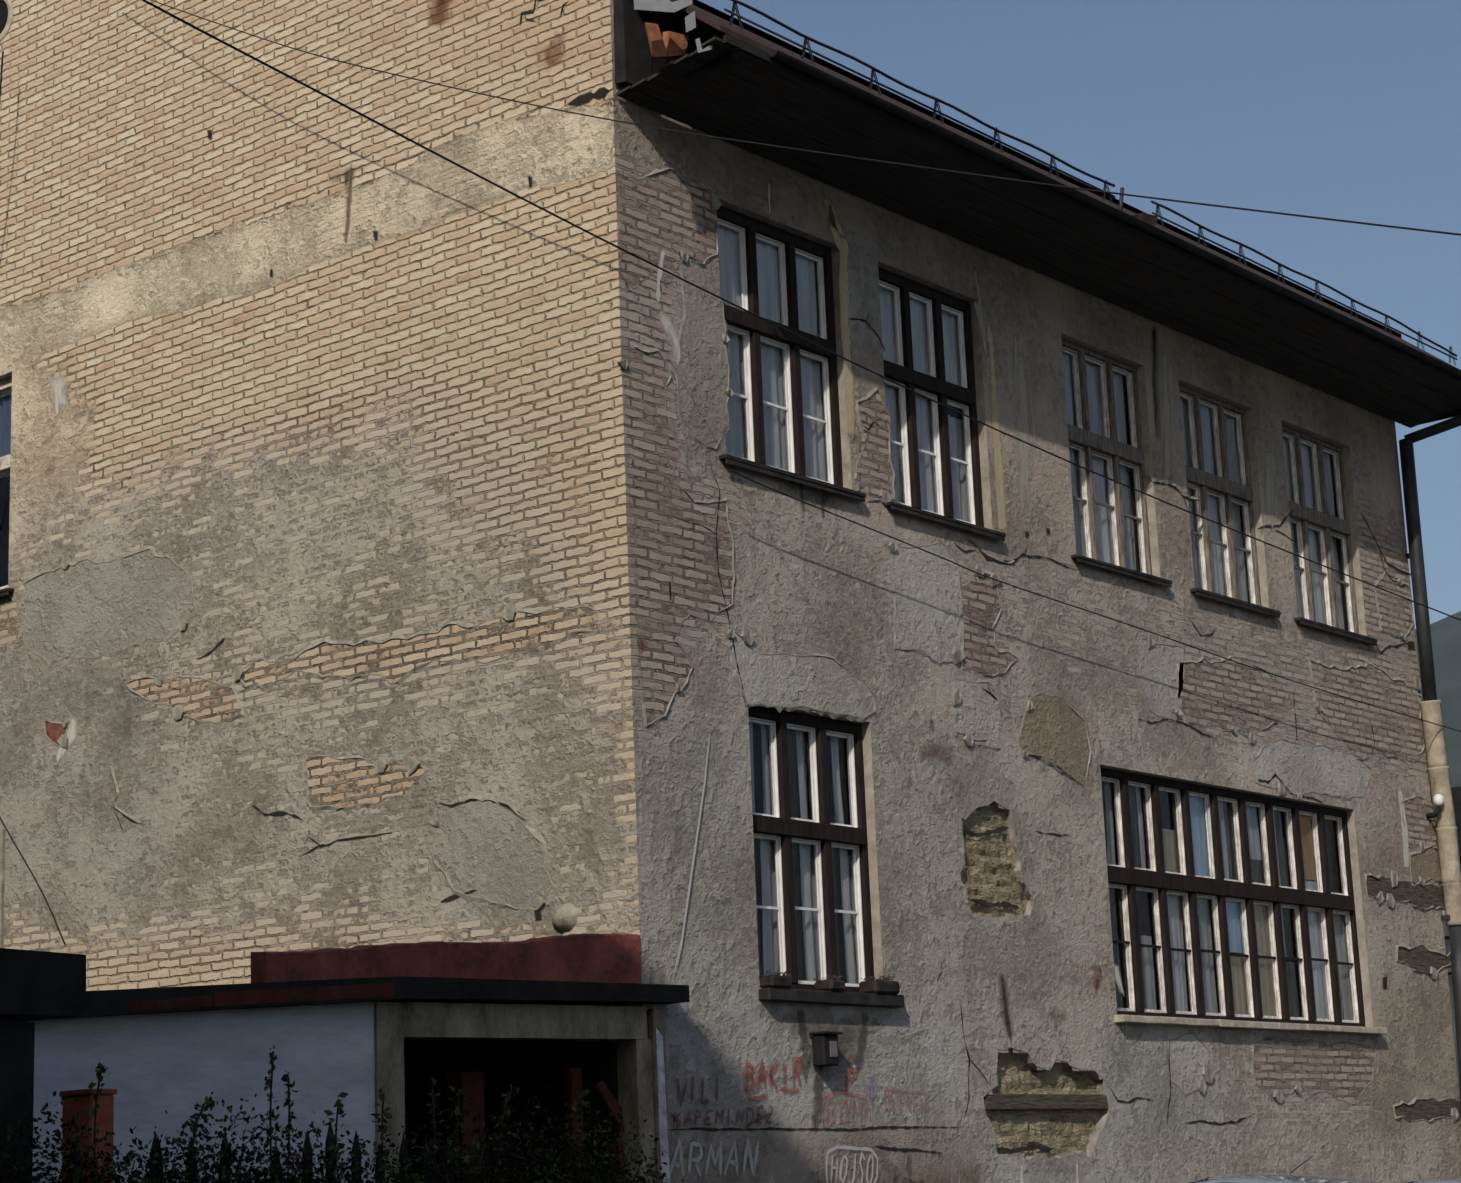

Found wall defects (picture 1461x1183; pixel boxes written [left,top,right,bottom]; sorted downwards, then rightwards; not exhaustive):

flaking render [615,168,876,728]
crack [956,539,1078,570]
crack [1360,512,1411,586]
flaking render [125,604,600,725]
peeling [888,541,1018,751]
flaking render [1137,634,1425,802]
crack [251,805,392,855]
crack [438,799,528,821]
flaking render [952,788,1040,932]
flaking render [1364,795,1445,912]
flaking render [975,1034,1117,1172]
flaking render [1251,1033,1377,1107]